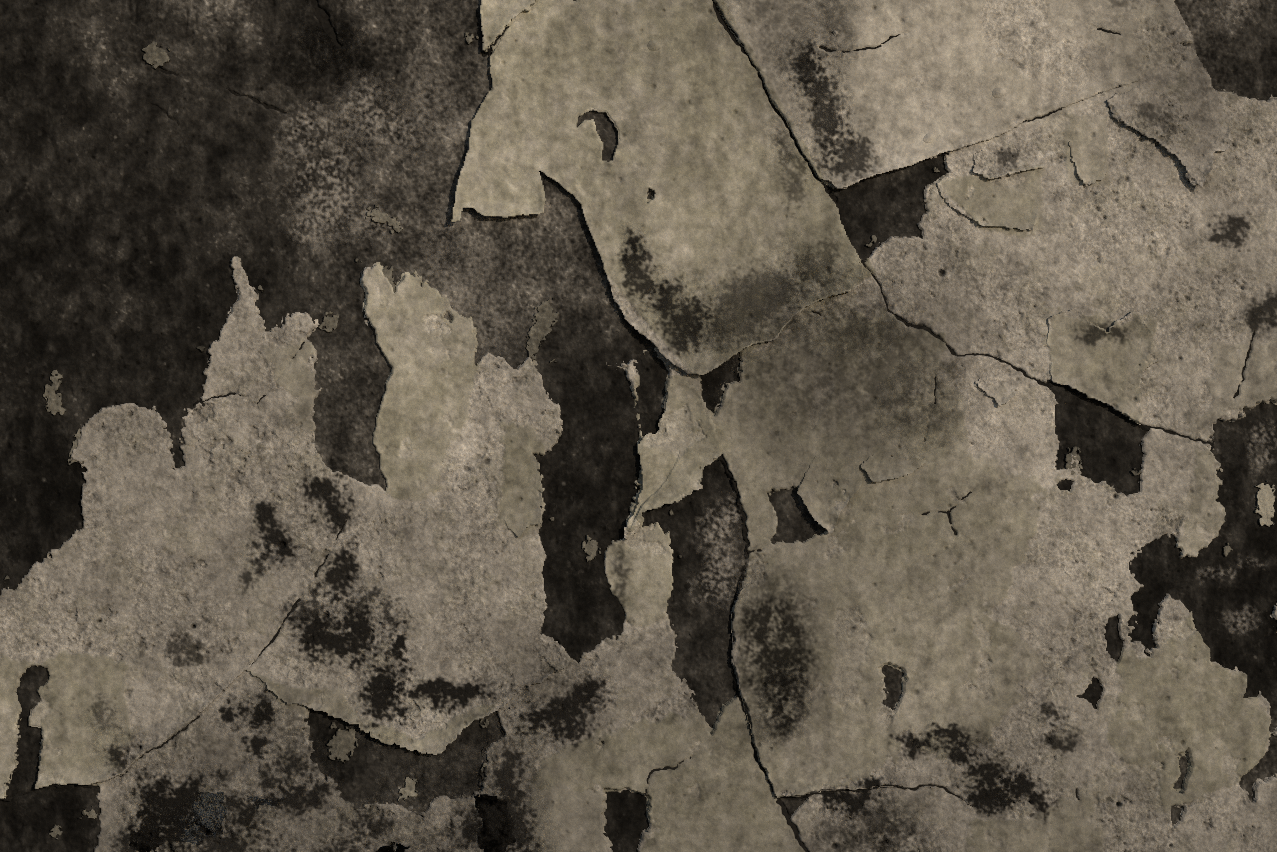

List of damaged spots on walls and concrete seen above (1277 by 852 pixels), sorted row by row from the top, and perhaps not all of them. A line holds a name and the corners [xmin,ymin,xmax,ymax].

crack [712,0,837,202]
damp [792,44,872,181]
crack [819,34,901,53]
peeling [1107,0,1277,188]
peeling [0,0,1158,595]
crack [859,260,1215,449]
damp [242,501,296,587]
damp [285,466,497,728]
peeling [0,362,949,852]
crack [719,454,973,852]
peeling [1104,400,1277,802]
damp [109,690,330,852]